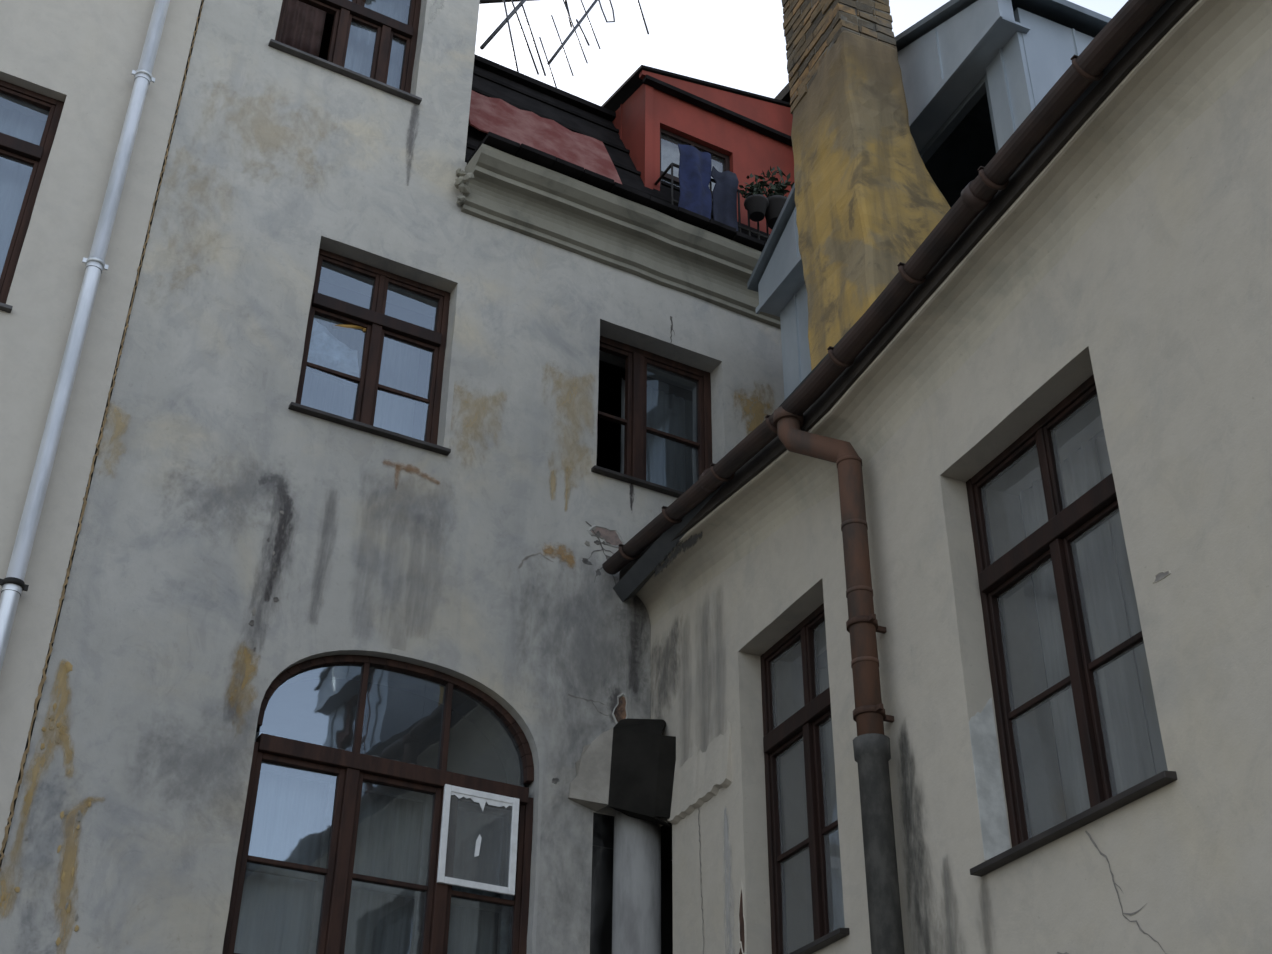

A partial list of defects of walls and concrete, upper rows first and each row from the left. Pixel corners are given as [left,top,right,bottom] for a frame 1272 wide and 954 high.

leakage [249,500,292,626]
flaking render [518,525,625,575]
peeling [13,661,73,854]
peeling [56,799,93,947]
crack [1085,831,1167,954]